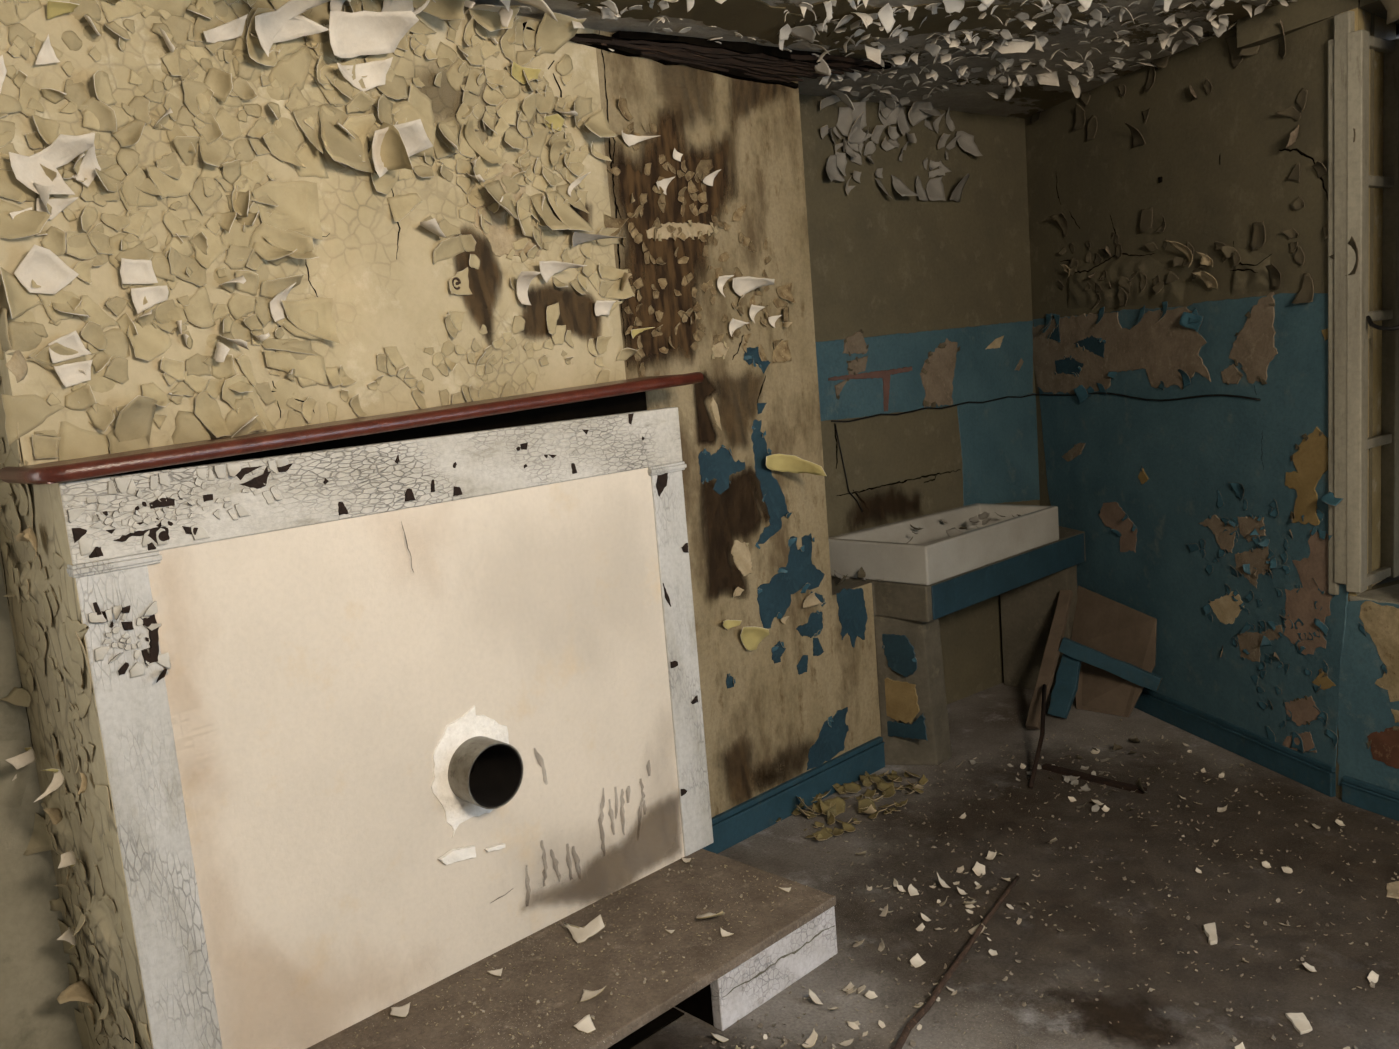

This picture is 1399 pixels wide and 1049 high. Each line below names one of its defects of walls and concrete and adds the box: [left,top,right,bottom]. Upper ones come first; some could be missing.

peeling [0,0,1314,468]
peeling [67,456,293,558]
peeling [405,489,416,502]
peeling [656,473,668,497]
peeling [751,426,827,476]
flaking render [731,540,763,598]
peeling [723,583,826,652]
flaking render [1185,427,1343,753]
flaking render [885,678,920,724]
flaking render [1358,601,1399,769]
peeling [0,482,171,1049]
leakage [1053,992,1181,1049]